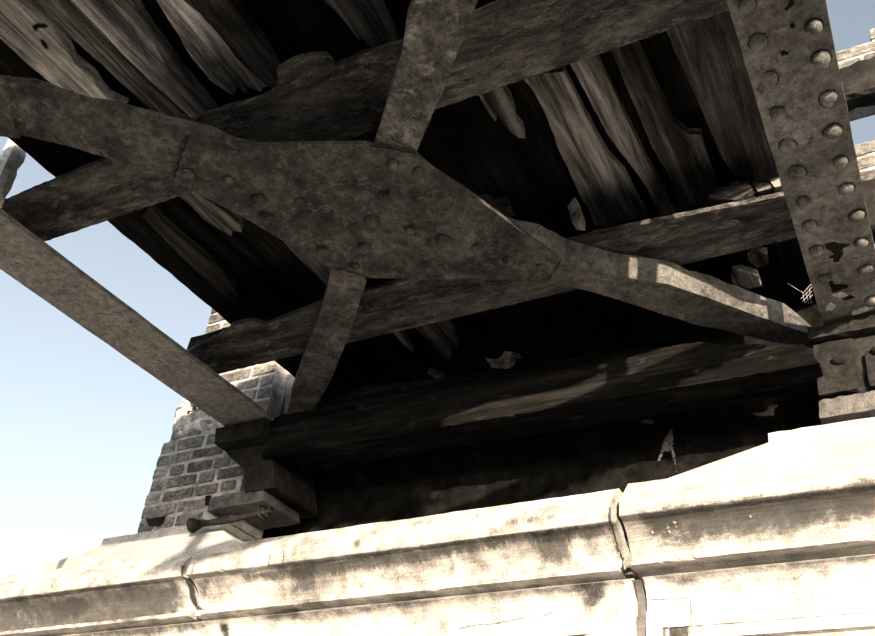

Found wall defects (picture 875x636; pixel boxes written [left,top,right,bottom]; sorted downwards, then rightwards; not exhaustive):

leakage [533,530,572,563]
leakage [292,567,313,592]
crack [609,502,692,636]